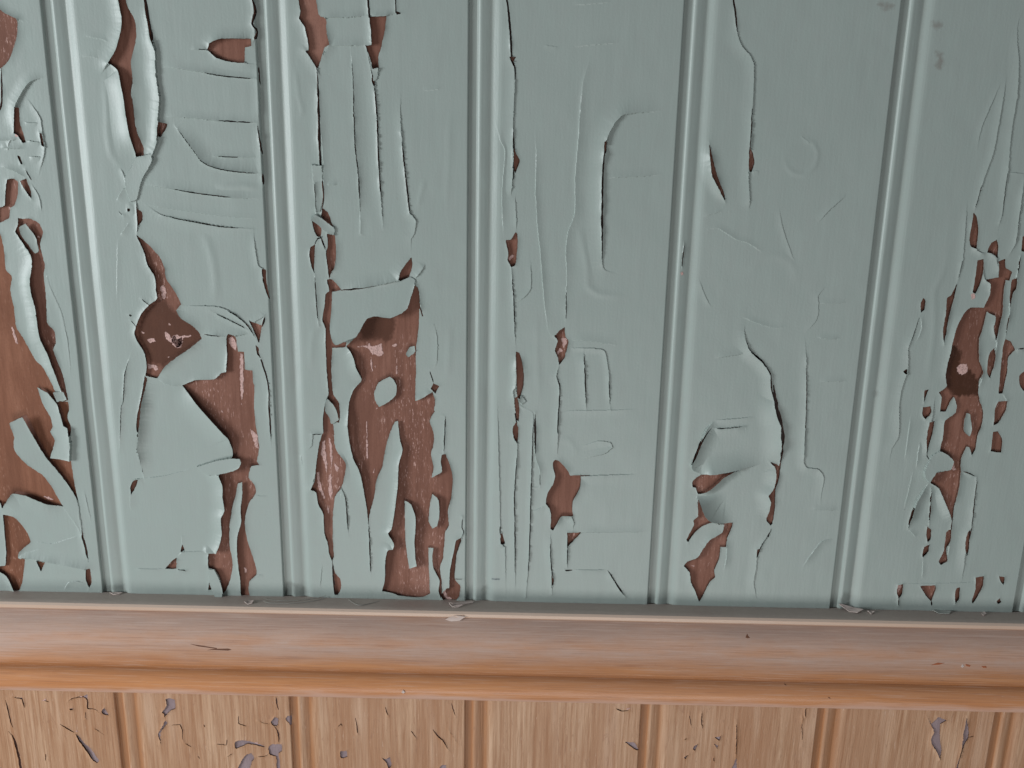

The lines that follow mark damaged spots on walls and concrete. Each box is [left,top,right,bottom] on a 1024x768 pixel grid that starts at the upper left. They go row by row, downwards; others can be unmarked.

peeling [0,72,94,591]
peeling [84,0,272,597]
crack [138,0,265,236]
peeling [292,0,401,86]
peeling [300,165,465,621]
crack [525,411,625,596]
crack [498,0,657,327]
crack [568,347,629,415]
peeling [684,416,758,600]
crack [701,0,759,208]
crack [717,289,835,596]
peeling [889,208,1024,614]